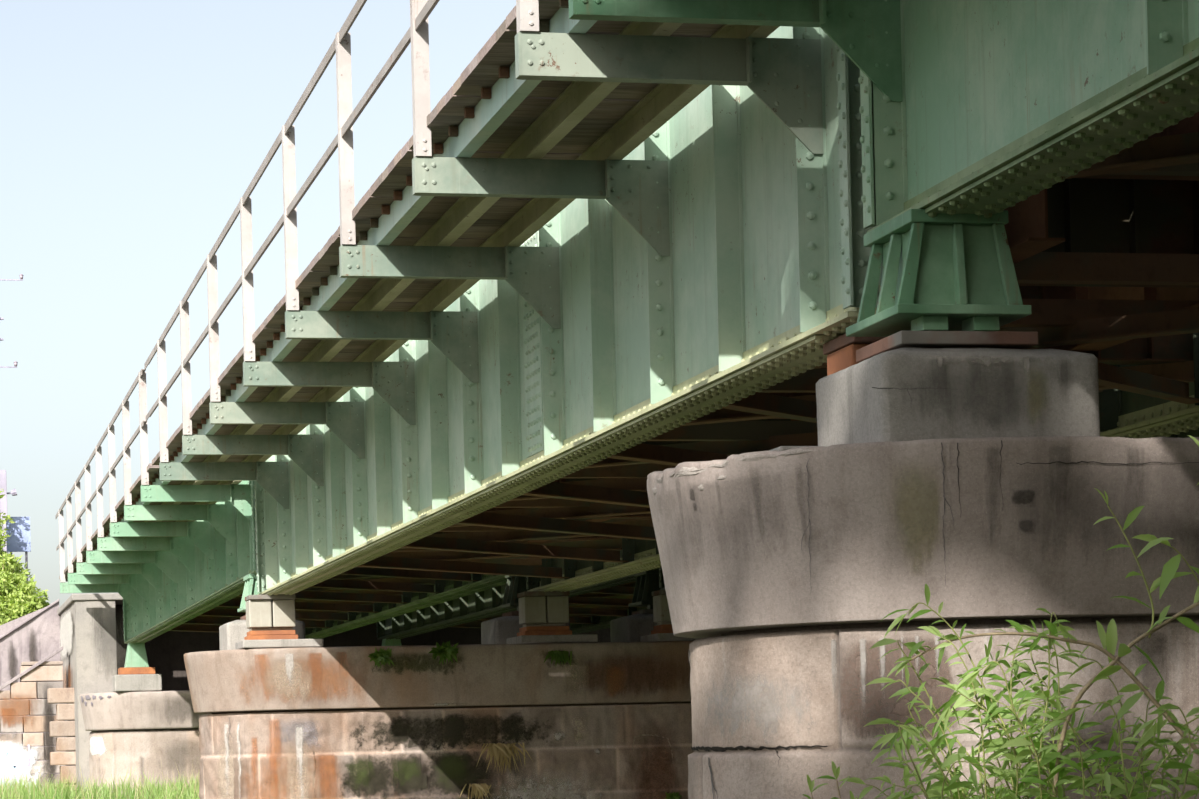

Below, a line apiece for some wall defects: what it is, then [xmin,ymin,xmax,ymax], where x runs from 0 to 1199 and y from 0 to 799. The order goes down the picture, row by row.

spalling [652,449,816,497]
crack [1000,440,1199,511]
crack [941,442,961,584]
water stain [390,717,407,744]
water stain [502,715,526,743]